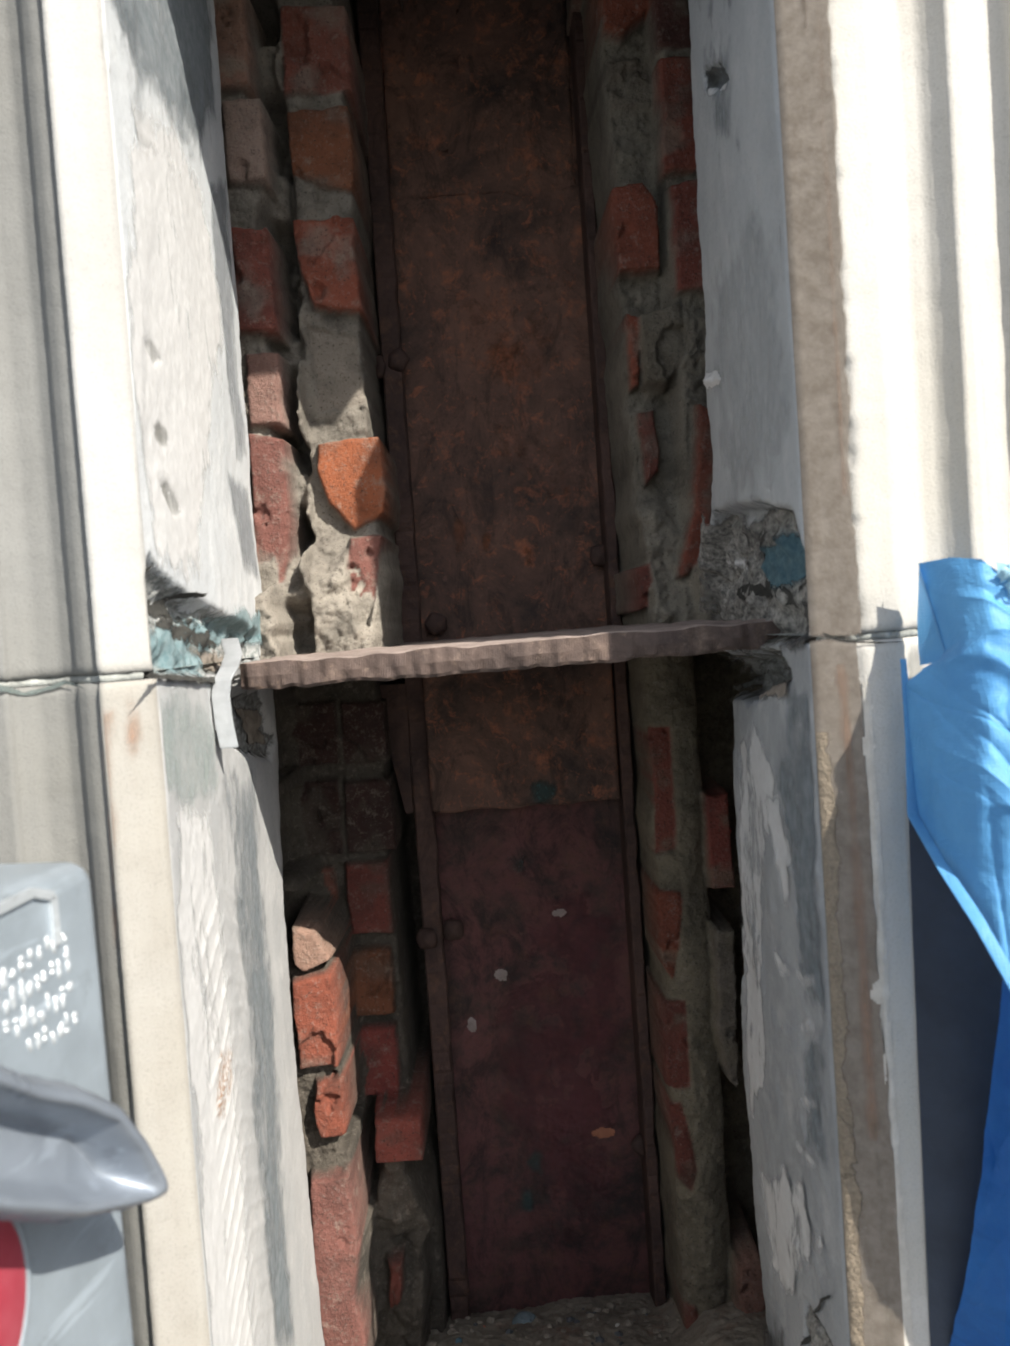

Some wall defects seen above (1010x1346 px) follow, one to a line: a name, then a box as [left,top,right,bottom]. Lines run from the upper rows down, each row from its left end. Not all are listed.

water stain [114,0,214,139]
spalling [145,570,262,677]
spalling [698,508,816,699]
spalling [806,1306,833,1346]